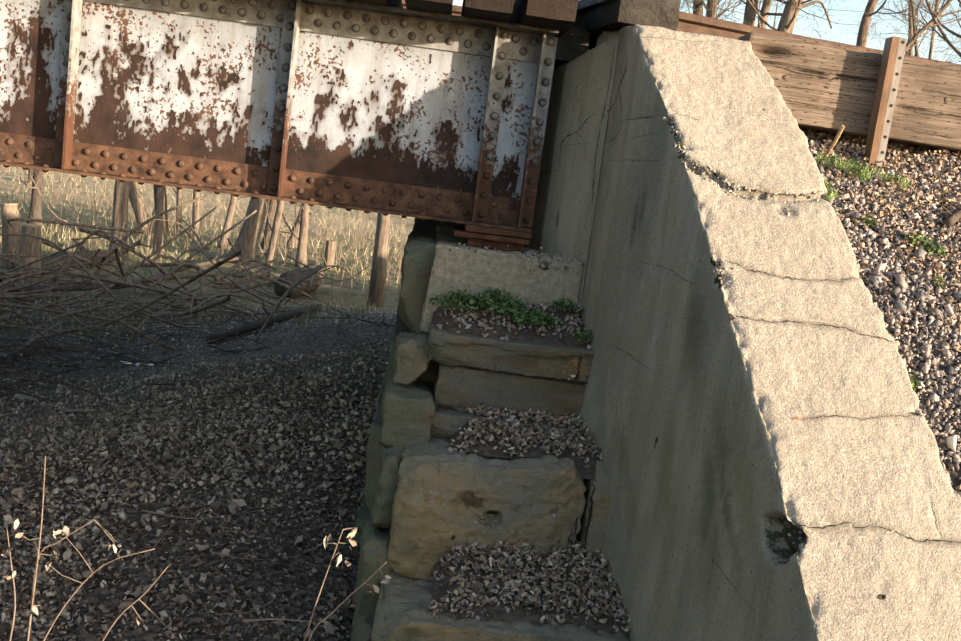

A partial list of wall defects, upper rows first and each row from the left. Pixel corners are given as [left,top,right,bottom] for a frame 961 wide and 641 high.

peeling [73,24,271,167]
crack [540,33,822,201]
spalling [663,114,824,216]
crack [729,261,857,282]
crack [729,314,892,342]
crack [804,414,913,422]
crack [798,501,961,543]